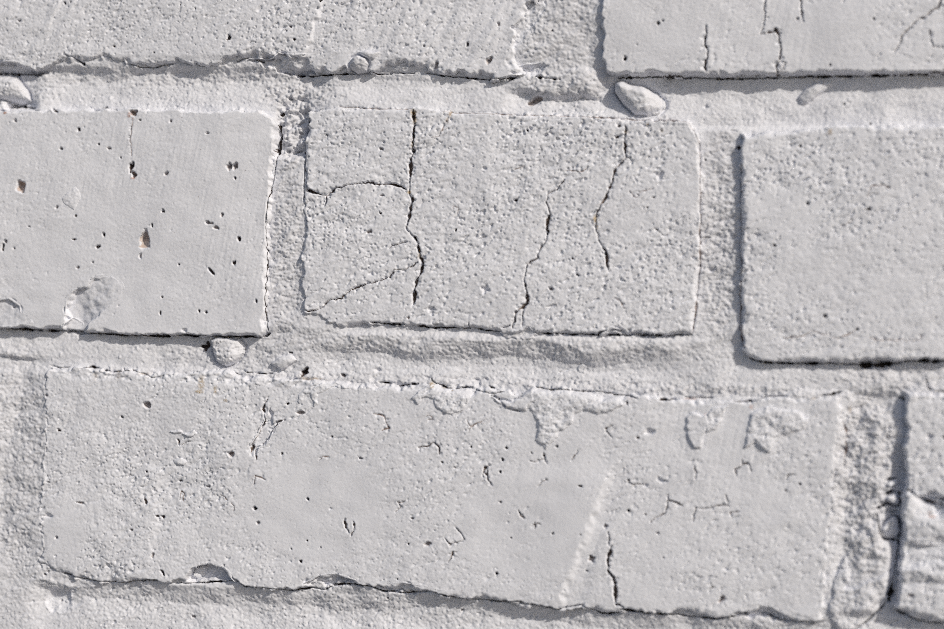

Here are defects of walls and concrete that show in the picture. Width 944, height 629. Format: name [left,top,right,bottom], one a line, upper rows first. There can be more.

crack [702,28,710,71]
crack [760,0,786,76]
crack [894,0,944,74]
crack [306,112,447,312]
crack [512,168,587,328]
crack [595,126,652,269]
spalling [0,297,34,329]
spalling [61,274,125,334]
crack [606,532,623,607]